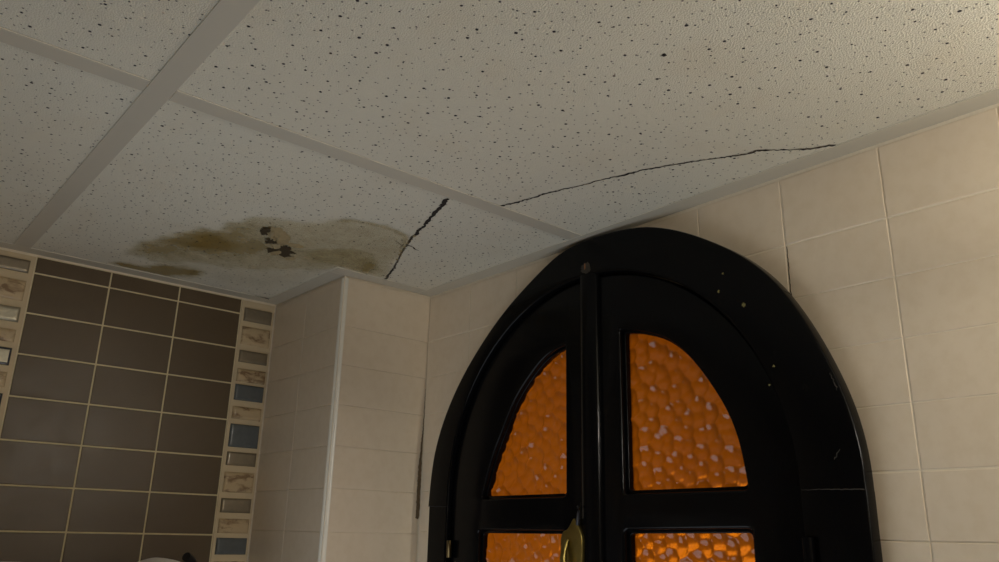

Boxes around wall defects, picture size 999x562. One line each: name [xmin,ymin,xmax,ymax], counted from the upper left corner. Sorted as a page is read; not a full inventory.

crack [501,145,835,206]
damp [116,224,270,276]
crack [386,198,450,279]